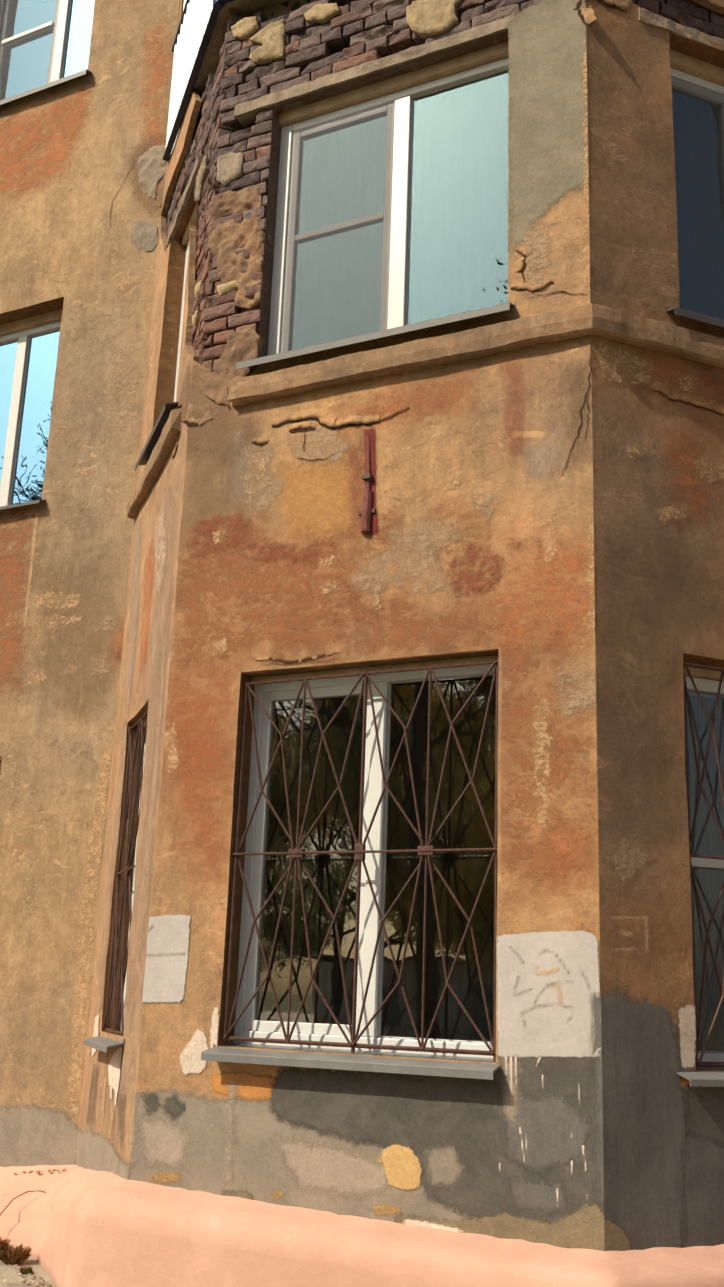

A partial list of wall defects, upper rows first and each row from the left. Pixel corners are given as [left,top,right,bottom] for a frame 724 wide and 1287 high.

spalling [598,0,724,39]
spalling [133,0,540,380]
crack [511,243,585,296]
crack [252,400,409,461]
crack [562,341,593,473]
crack [654,382,724,415]